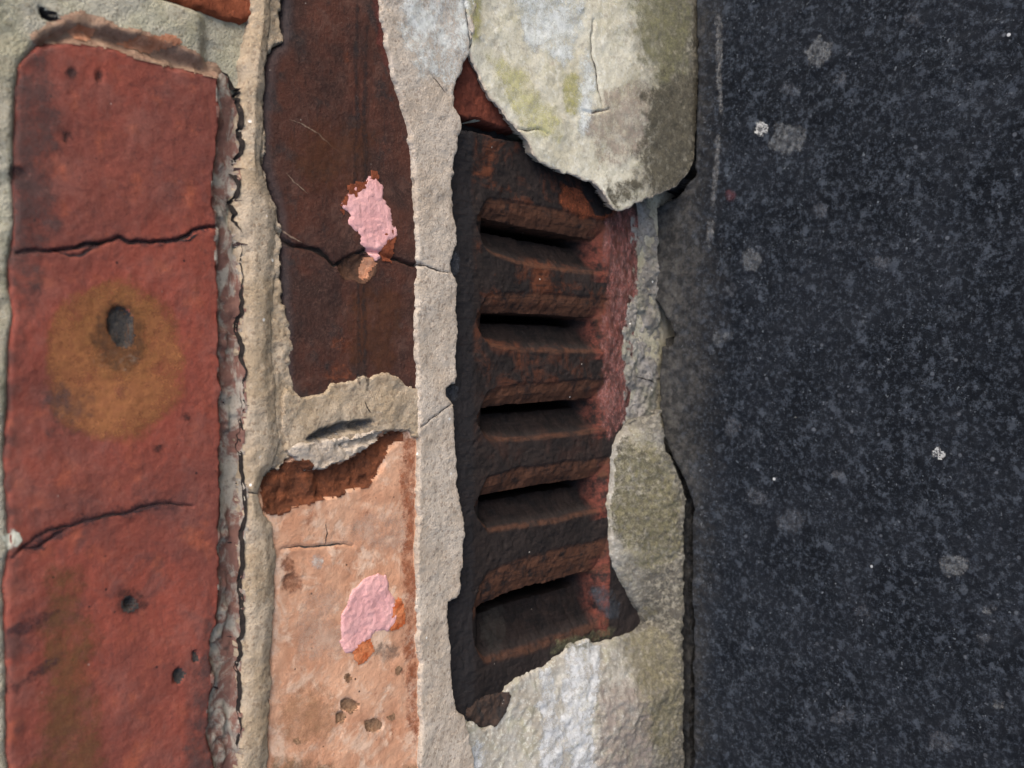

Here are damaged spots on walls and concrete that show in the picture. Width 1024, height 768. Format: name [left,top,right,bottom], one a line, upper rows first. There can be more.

crack [15,227,214,257]
crack [280,239,448,273]
rust [46,282,184,439]
spalling [30,0,403,768]
crack [13,503,189,557]